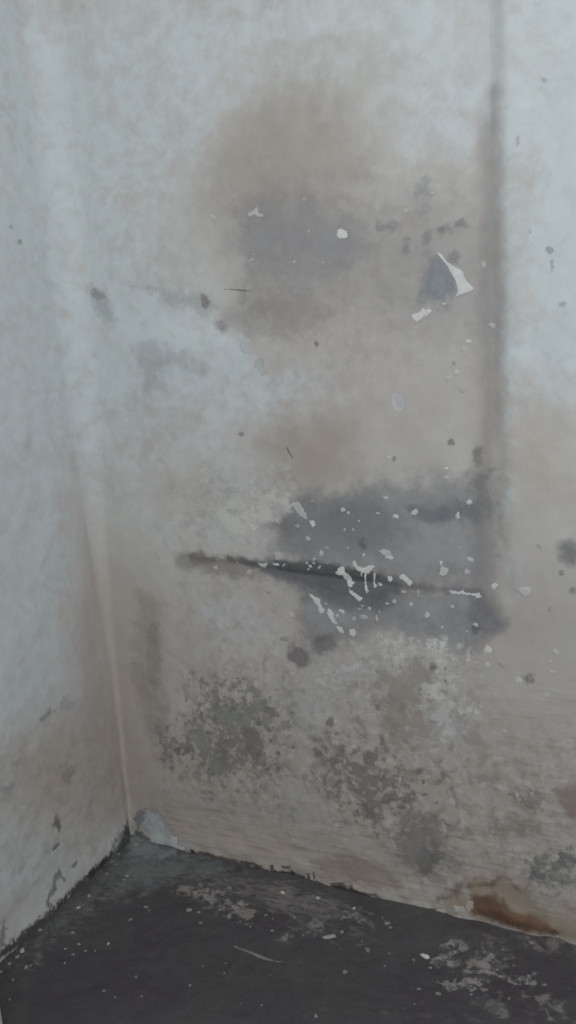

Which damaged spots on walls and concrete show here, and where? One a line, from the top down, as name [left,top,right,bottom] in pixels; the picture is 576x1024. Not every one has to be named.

peeling [412,251,474,329]
crack [178,552,428,605]
leakage [156,673,295,800]
leakage [313,663,453,874]
rust [454,881,576,936]